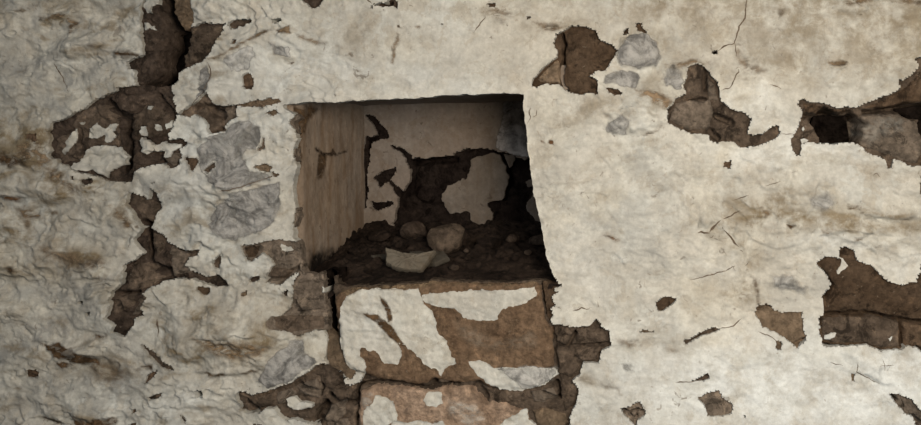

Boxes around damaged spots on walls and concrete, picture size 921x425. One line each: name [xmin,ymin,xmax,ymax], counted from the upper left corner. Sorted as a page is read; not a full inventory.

flaking render [532,23,660,95]
crack [718,0,747,90]
peeling [606,116,629,135]
flaking render [664,64,780,148]
flaking render [791,58,921,168]
flaking render [50,0,611,425]
flaking render [755,303,806,350]
flaking render [817,247,921,350]
flaking render [890,393,921,425]